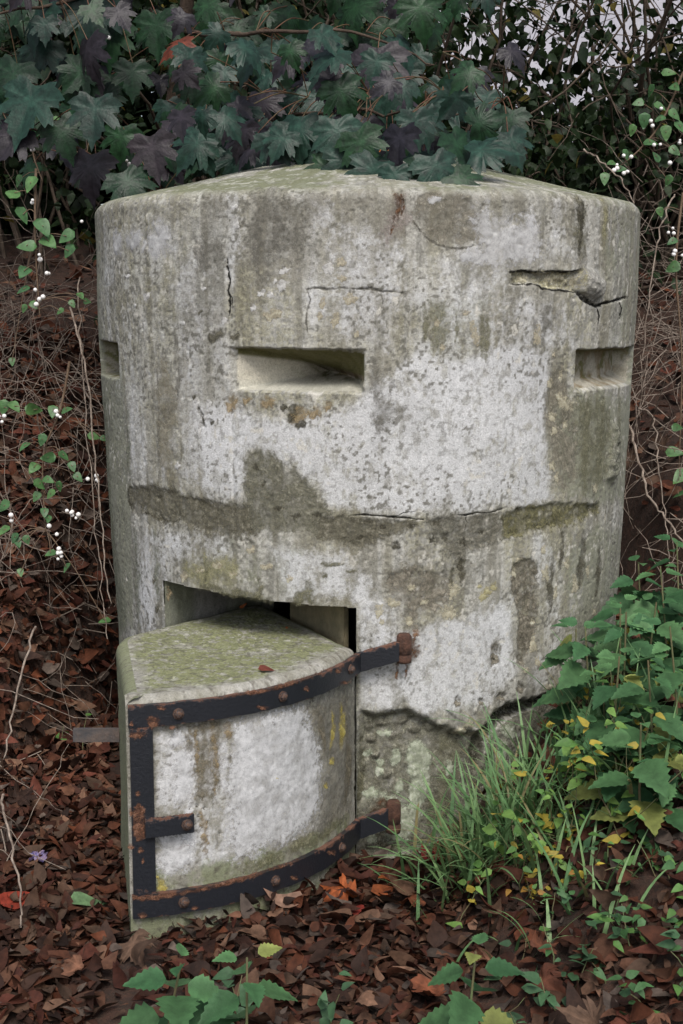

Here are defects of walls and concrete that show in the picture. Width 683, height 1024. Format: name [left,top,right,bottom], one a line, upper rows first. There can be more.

crack [225,262,233,314]
crack [305,287,402,332]
crack [509,269,628,322]
crack [353,512,424,520]
crack [457,508,503,528]